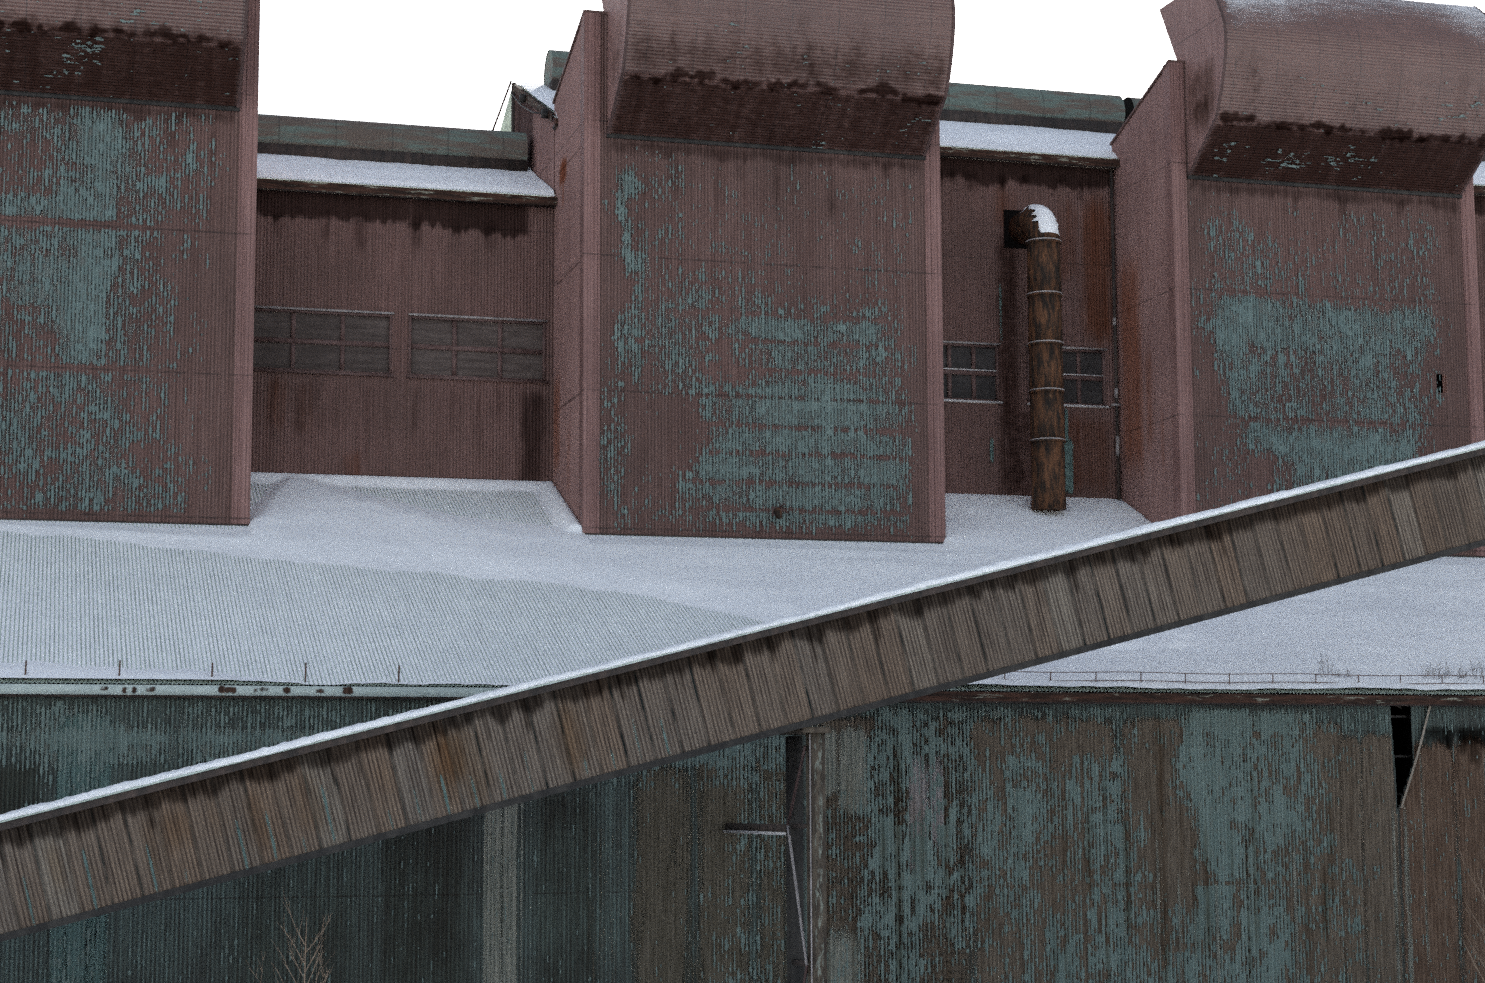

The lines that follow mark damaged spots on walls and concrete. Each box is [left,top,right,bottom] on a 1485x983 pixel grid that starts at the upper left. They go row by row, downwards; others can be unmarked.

peeling [0,21,229,517]
peeling [599,131,917,538]
peeling [1190,142,1452,518]
corrosion [218,685,237,694]
peeling [322,836,510,983]
peeling [565,734,792,983]
peeling [826,706,1485,983]